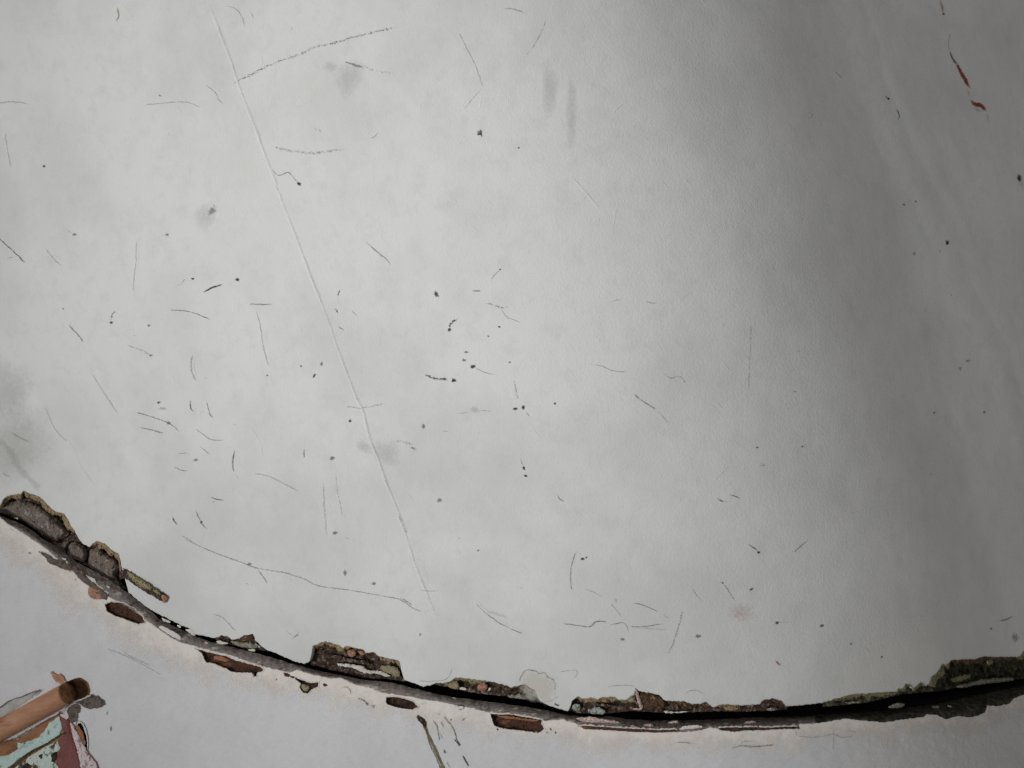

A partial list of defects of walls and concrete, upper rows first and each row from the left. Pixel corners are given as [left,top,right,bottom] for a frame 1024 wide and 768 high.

peeling [0,491,1024,766]